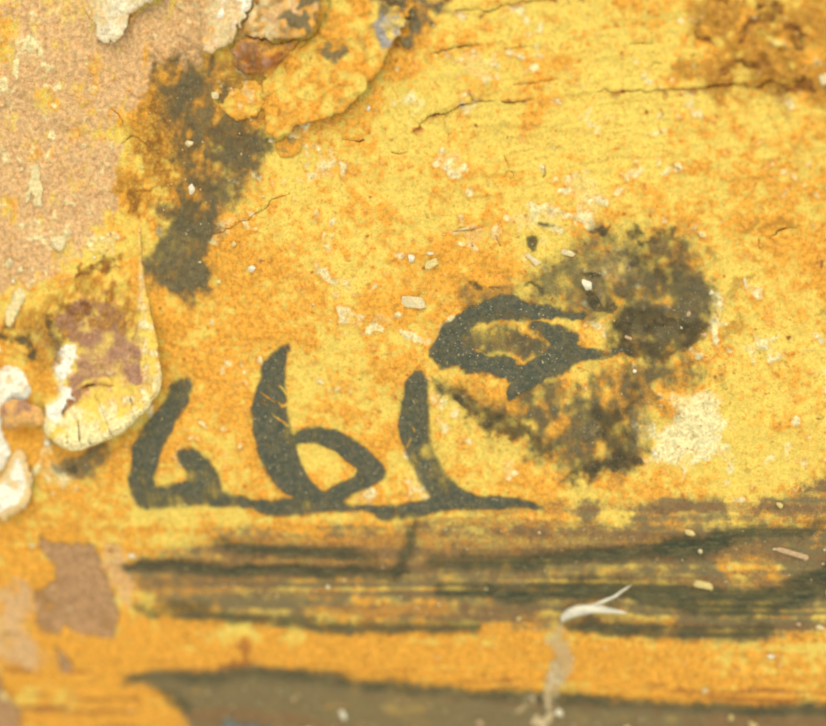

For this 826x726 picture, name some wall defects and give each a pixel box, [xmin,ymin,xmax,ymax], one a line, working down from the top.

peeling [84,0,153,44]
peeling [196,0,416,158]
crack [412,79,555,133]
crack [600,80,797,93]
damp [145,57,267,301]
peeling [0,217,162,521]
damp [437,225,711,483]
damp [123,523,416,581]
damp [428,520,826,571]
damp [134,602,481,636]